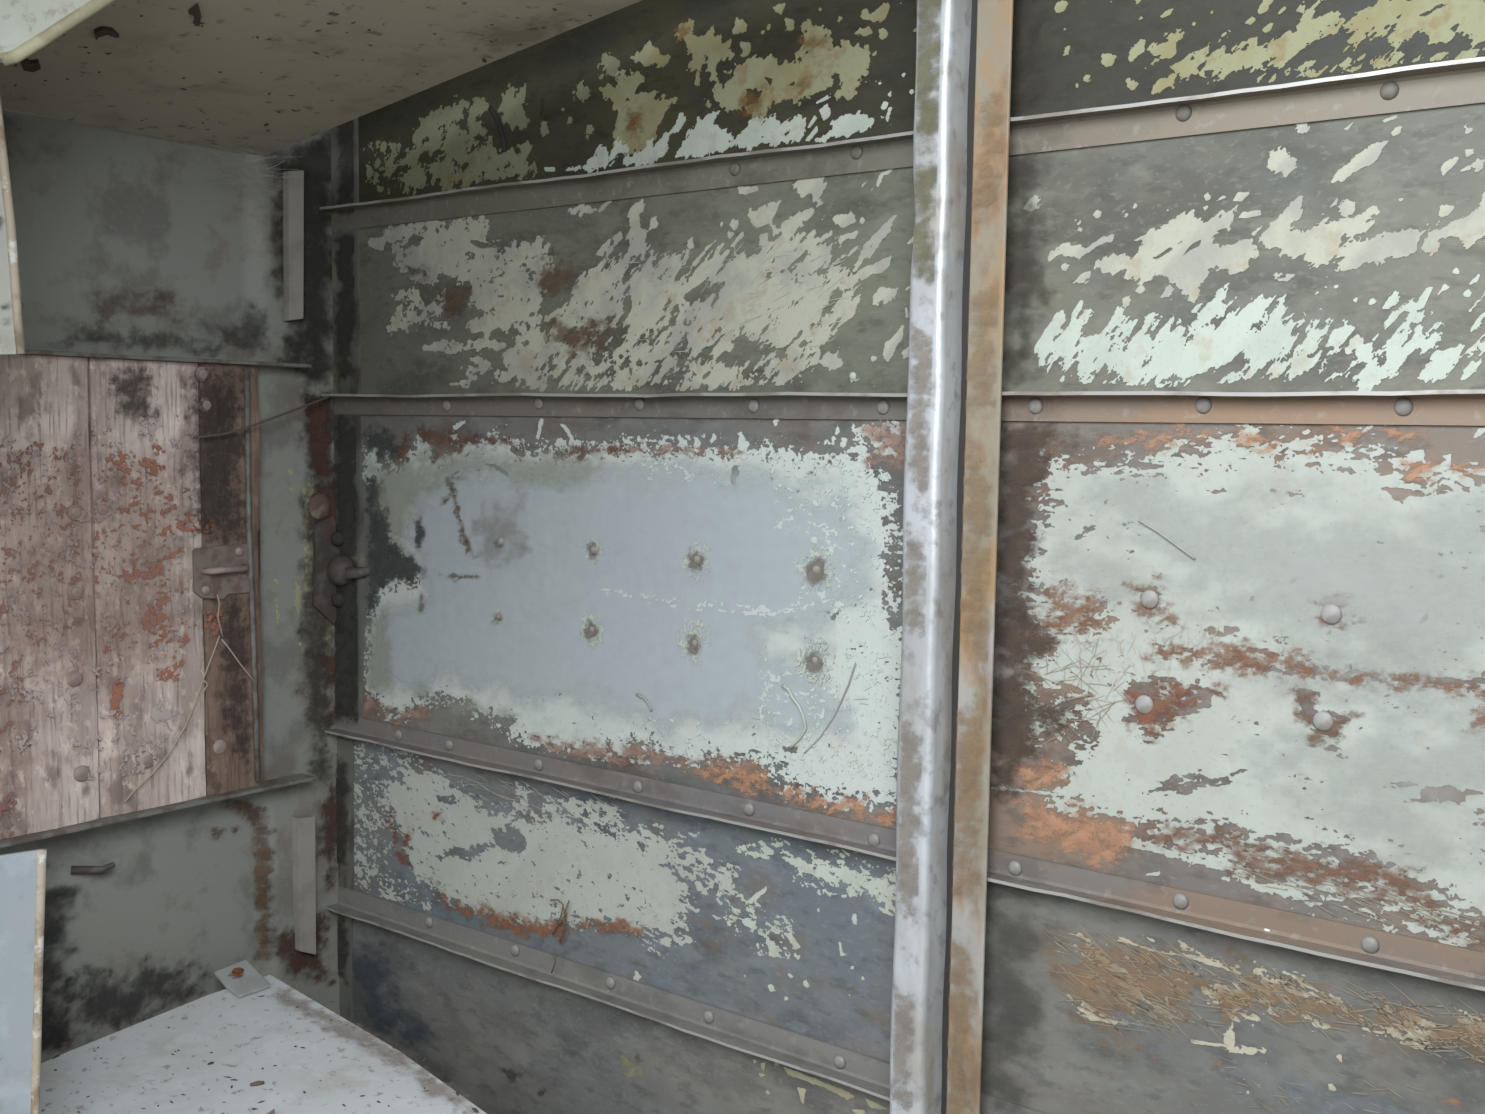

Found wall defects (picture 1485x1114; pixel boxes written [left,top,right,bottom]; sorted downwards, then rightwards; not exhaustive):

peeling [363,2,901,196]
peeling [368,177,910,392]
peeling [1034,115,1485,391]
corrosion [550,443,742,461]
corrosion [862,323,932,492]
peeling [361,418,903,816]
corrosion [952,426,1135,894]
peeling [991,423,1485,947]
corrosion [1143,639,1485,745]
peeling [354,742,896,988]
corrosion [530,724,922,915]
corrosion [1151,825,1485,946]